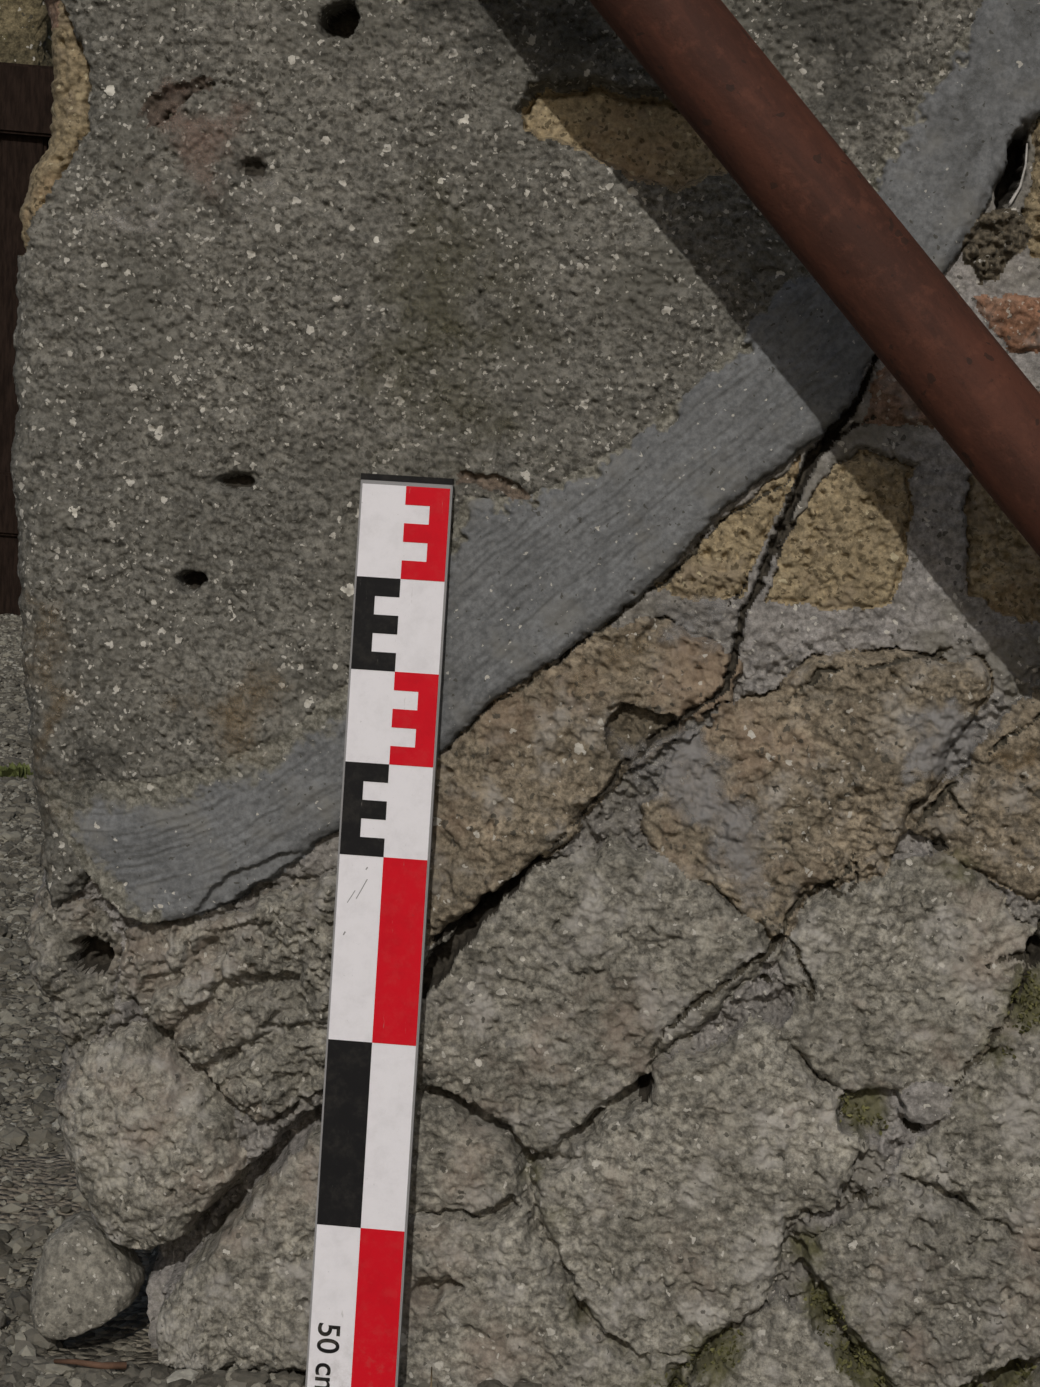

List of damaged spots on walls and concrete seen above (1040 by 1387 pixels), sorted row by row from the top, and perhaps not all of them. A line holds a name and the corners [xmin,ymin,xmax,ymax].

spalling [521,85,728,193]
spalling [961,208,1033,285]
crack [422,354,879,999]
crack [786,641,972,705]
crack [916,713,1040,828]
crack [650,852,860,1058]
crack [954,919,1040,1086]
crack [809,1189,879,1218]